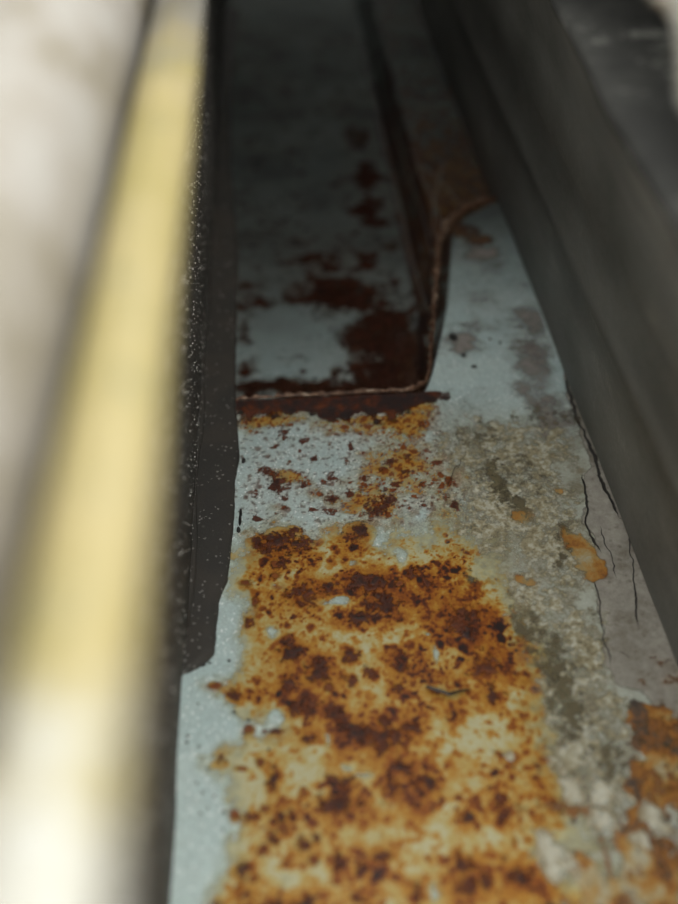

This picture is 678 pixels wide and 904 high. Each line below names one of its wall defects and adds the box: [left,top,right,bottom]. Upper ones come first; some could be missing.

rust [206,0,678,904]
crack [565,375,639,666]